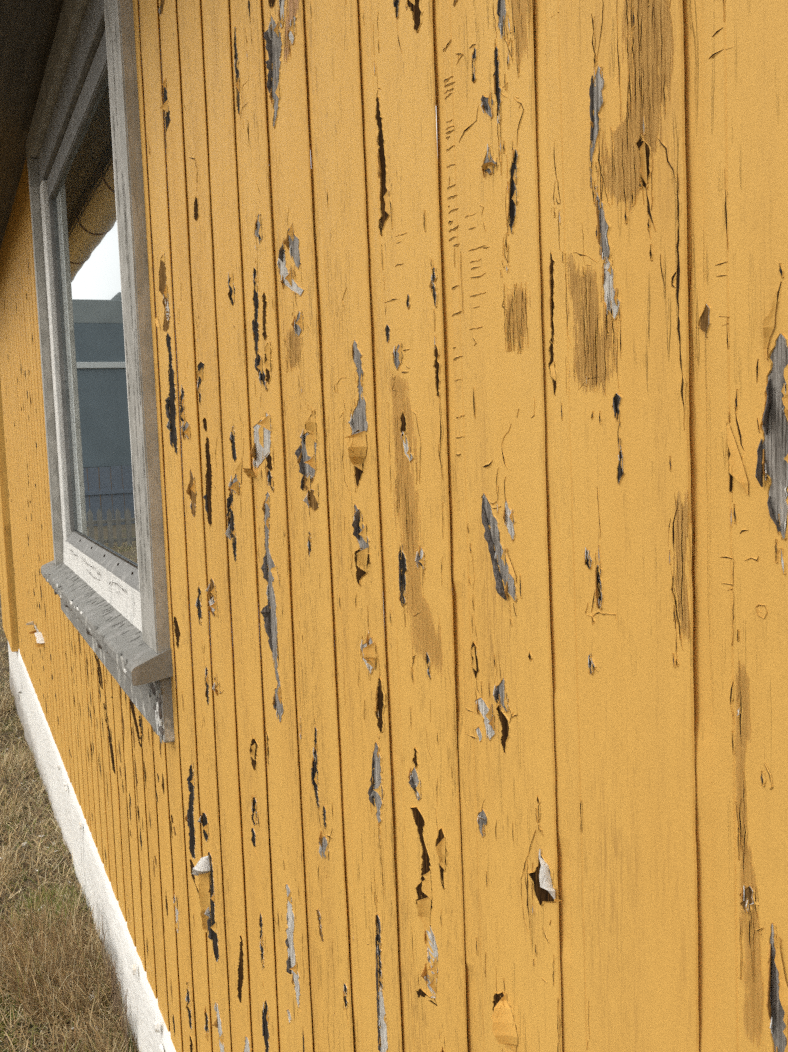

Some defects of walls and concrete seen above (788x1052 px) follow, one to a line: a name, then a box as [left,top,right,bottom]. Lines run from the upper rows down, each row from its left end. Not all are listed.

peeling [234,0,313,147]
peeling [393,0,424,53]
peeling [589,14,623,426]
peeling [155,204,285,723]
peeling [295,405,320,556]
peeling [334,340,372,587]
peeling [465,524,518,753]
peeling [481,468,523,626]
peeling [726,263,788,574]
peeling [408,747,449,1006]
peeling [521,795,562,966]
peeling [766,923,788,1052]